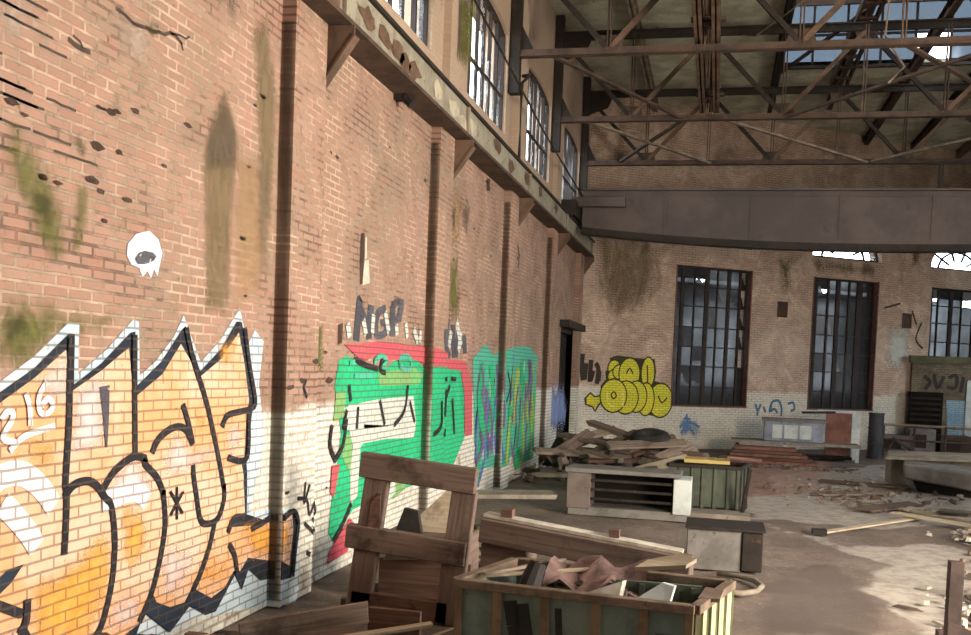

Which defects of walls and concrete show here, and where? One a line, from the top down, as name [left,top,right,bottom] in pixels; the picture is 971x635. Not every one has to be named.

crack [116,6,190,51]
peeling [359,5,422,80]
spalling [90,141,123,155]
spalling [96,105,139,116]
leakage [256,21,292,235]
peeling [433,79,476,138]
spalling [85,176,105,195]
leakage [206,108,235,307]
leakage [603,243,653,308]
leakage [267,254,285,599]